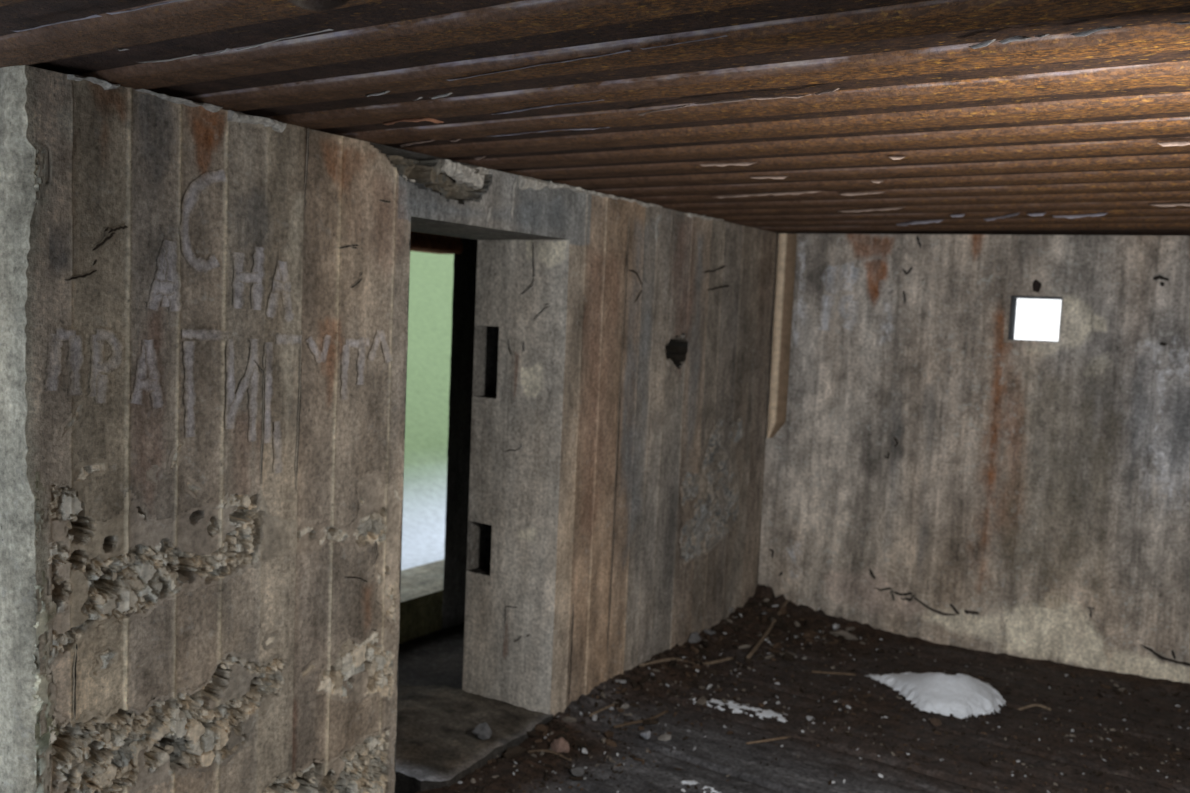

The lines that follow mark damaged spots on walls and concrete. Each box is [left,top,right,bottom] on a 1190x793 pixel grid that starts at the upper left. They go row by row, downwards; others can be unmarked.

spalling [31,438,401,793]
crack [868,568,979,616]
crack [1140,644,1190,667]